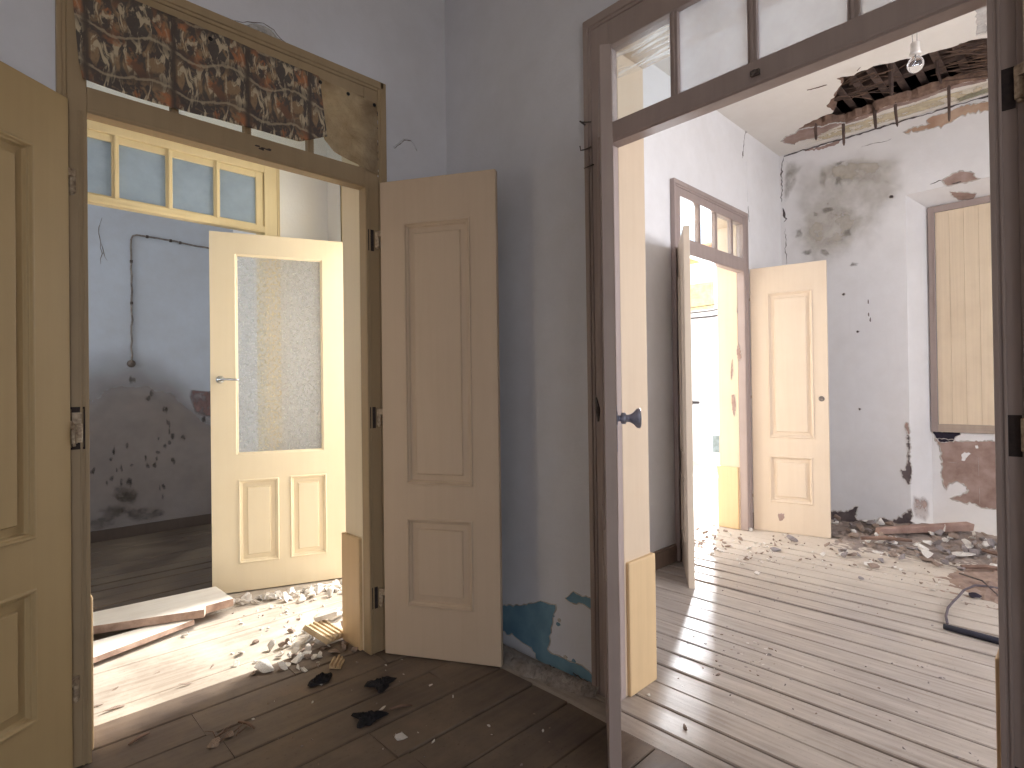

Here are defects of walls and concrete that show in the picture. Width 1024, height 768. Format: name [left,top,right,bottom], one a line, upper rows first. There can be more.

spalling [780,69,989,151]
crack [780,95,988,264]
flaking render [932,170,981,201]
peeling [191,390,211,416]
leakage [89,376,212,531]
flaking render [900,422,912,485]
flaking render [931,431,996,510]
flaking render [831,506,863,522]
flaking render [881,508,914,524]
peeling [503,591,599,698]